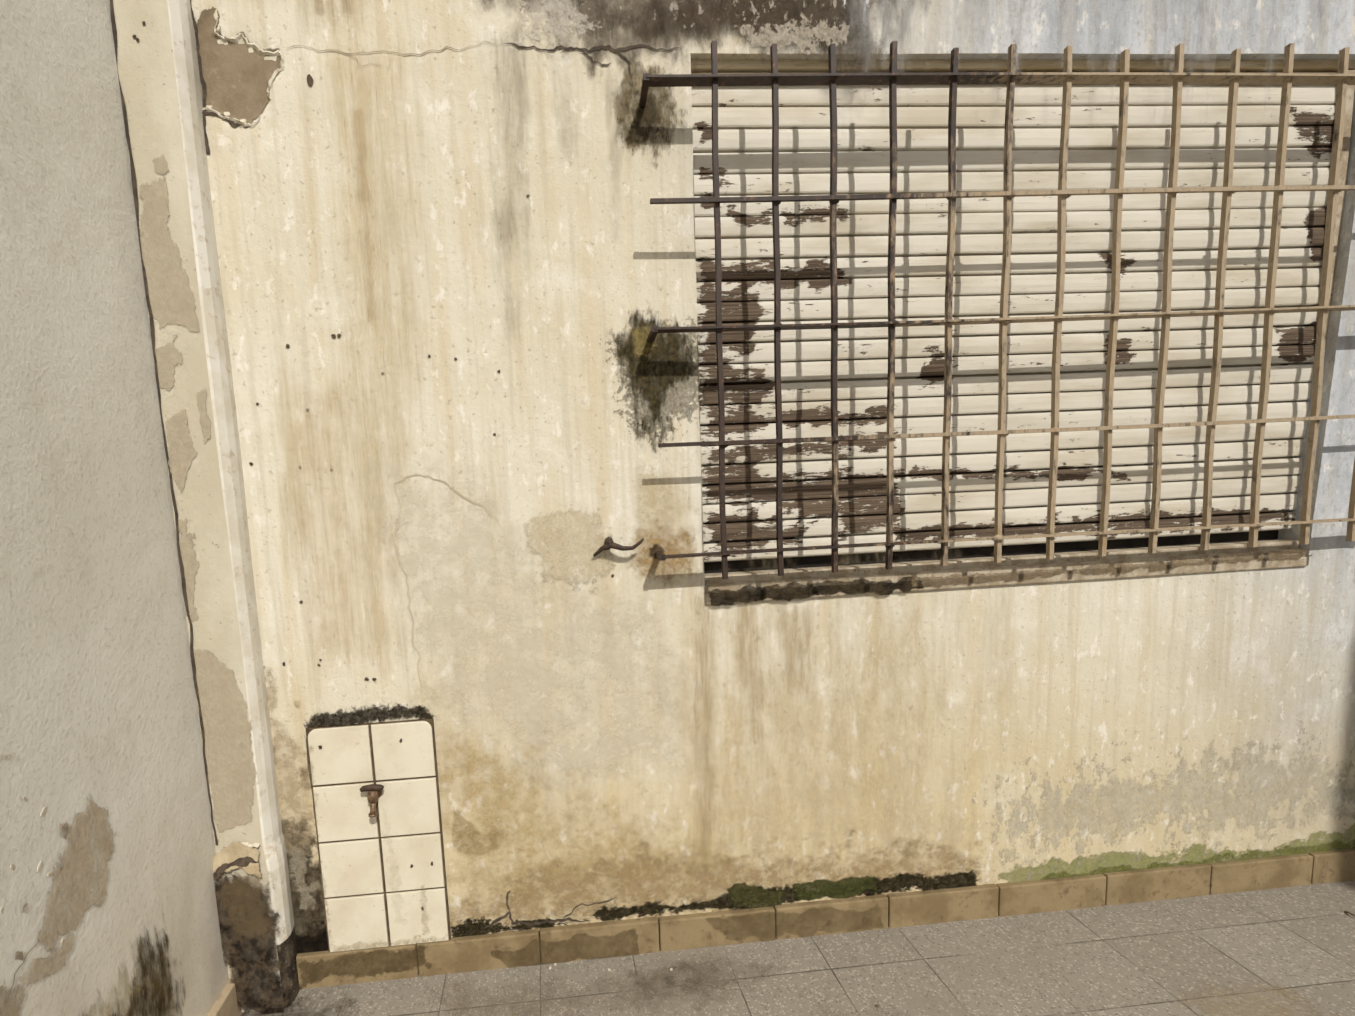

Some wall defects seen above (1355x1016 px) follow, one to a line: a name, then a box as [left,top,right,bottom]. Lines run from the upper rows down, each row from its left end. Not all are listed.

flaking render [197,7,285,128]
crack [283,41,682,79]
damp [501,0,906,156]
damp [613,311,694,451]
rust [633,528,690,579]
peeling [193,649,261,881]
peeling [0,797,114,1016]
damp [109,928,185,1016]
damp [215,817,329,1016]
damp [441,756,978,938]